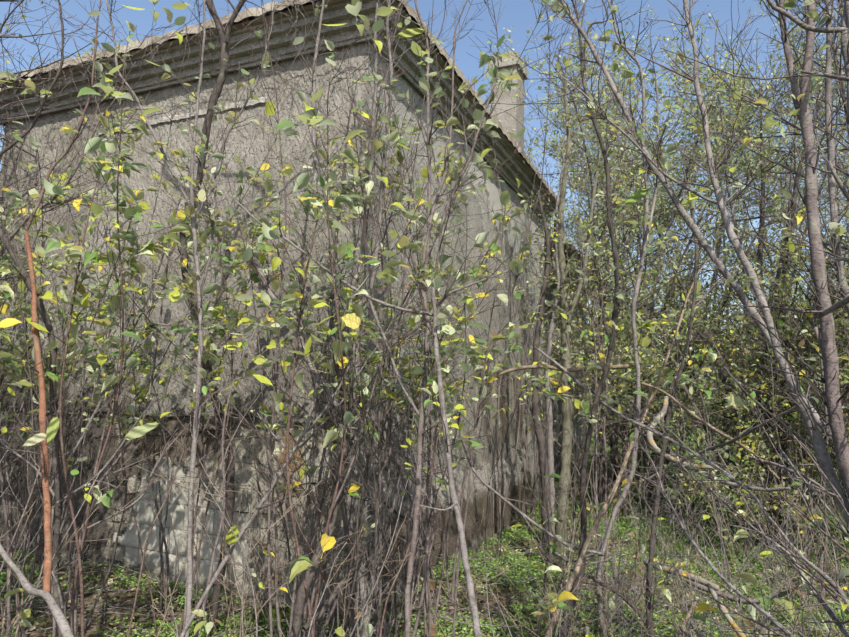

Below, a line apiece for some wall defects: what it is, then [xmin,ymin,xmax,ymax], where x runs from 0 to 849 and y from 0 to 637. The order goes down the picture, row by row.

flaking render [104,456,268,596]